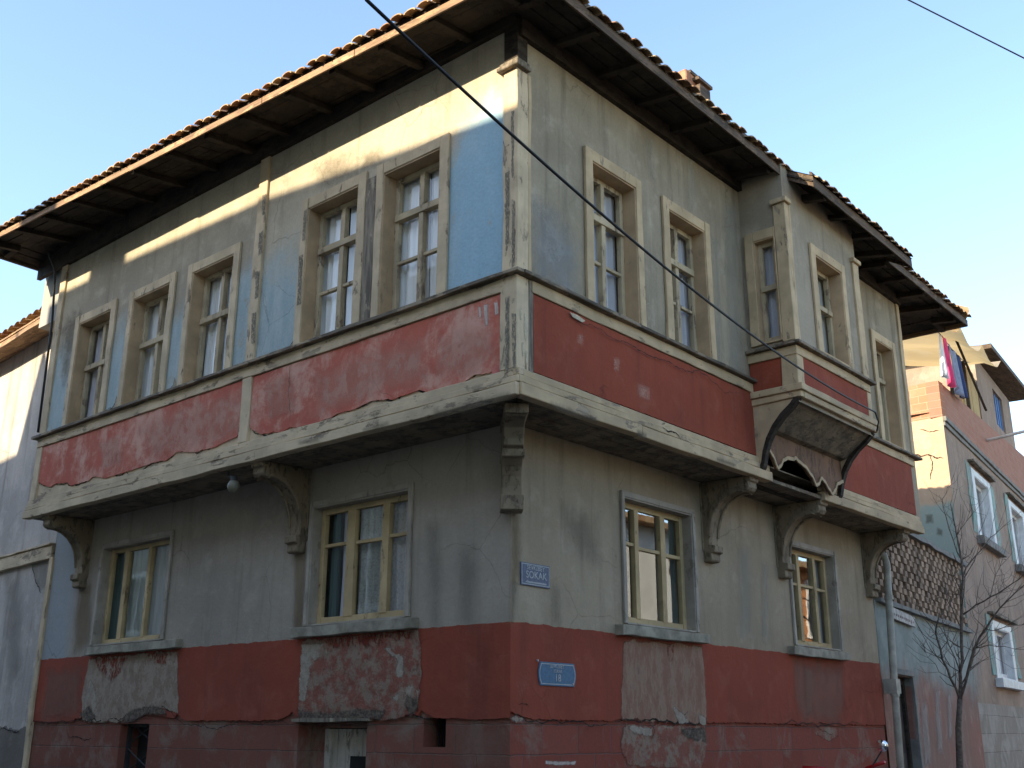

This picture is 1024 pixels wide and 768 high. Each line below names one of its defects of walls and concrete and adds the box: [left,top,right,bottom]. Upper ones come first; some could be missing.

peeling [505,111,515,267]
peeling [492,297,528,374]
crack [329,390,425,419]
spalling [80,651,179,723]
spalling [298,629,422,721]
spalling [621,639,707,742]